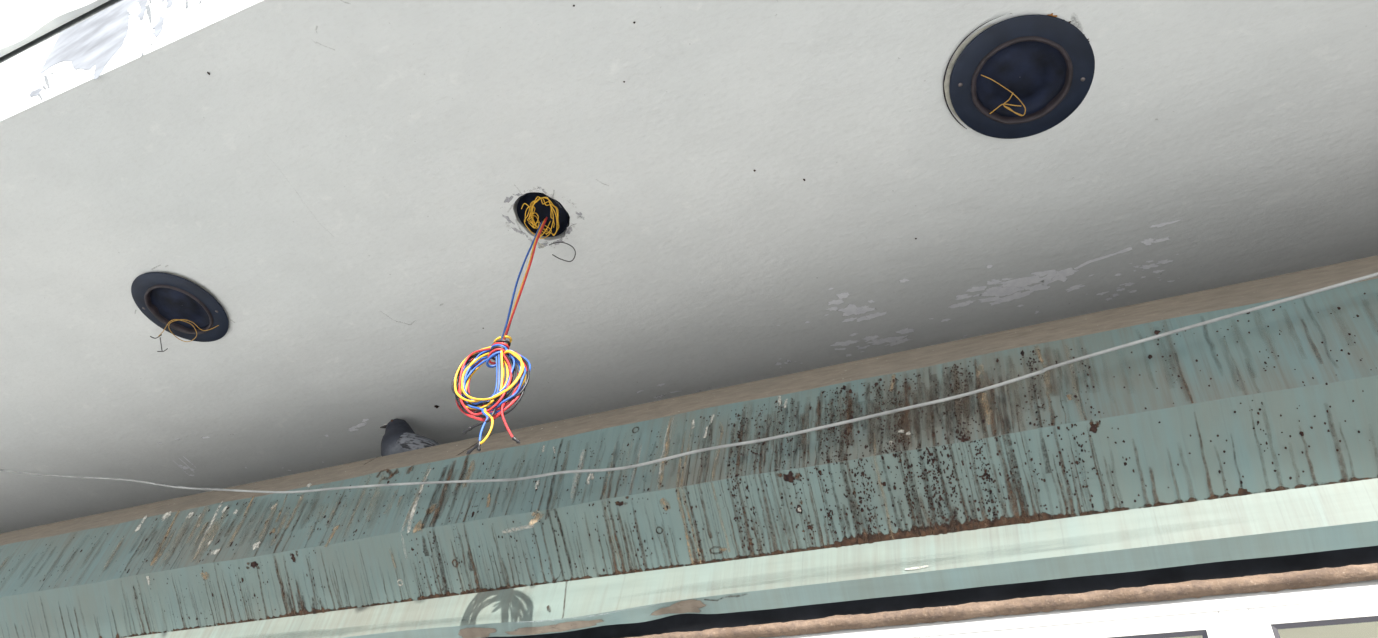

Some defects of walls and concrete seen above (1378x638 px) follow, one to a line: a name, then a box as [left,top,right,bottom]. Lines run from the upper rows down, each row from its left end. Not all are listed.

peeling [30,0,202,101]
peeling [929,219,1183,322]
peeling [825,288,914,357]
rust [99,413,1375,638]